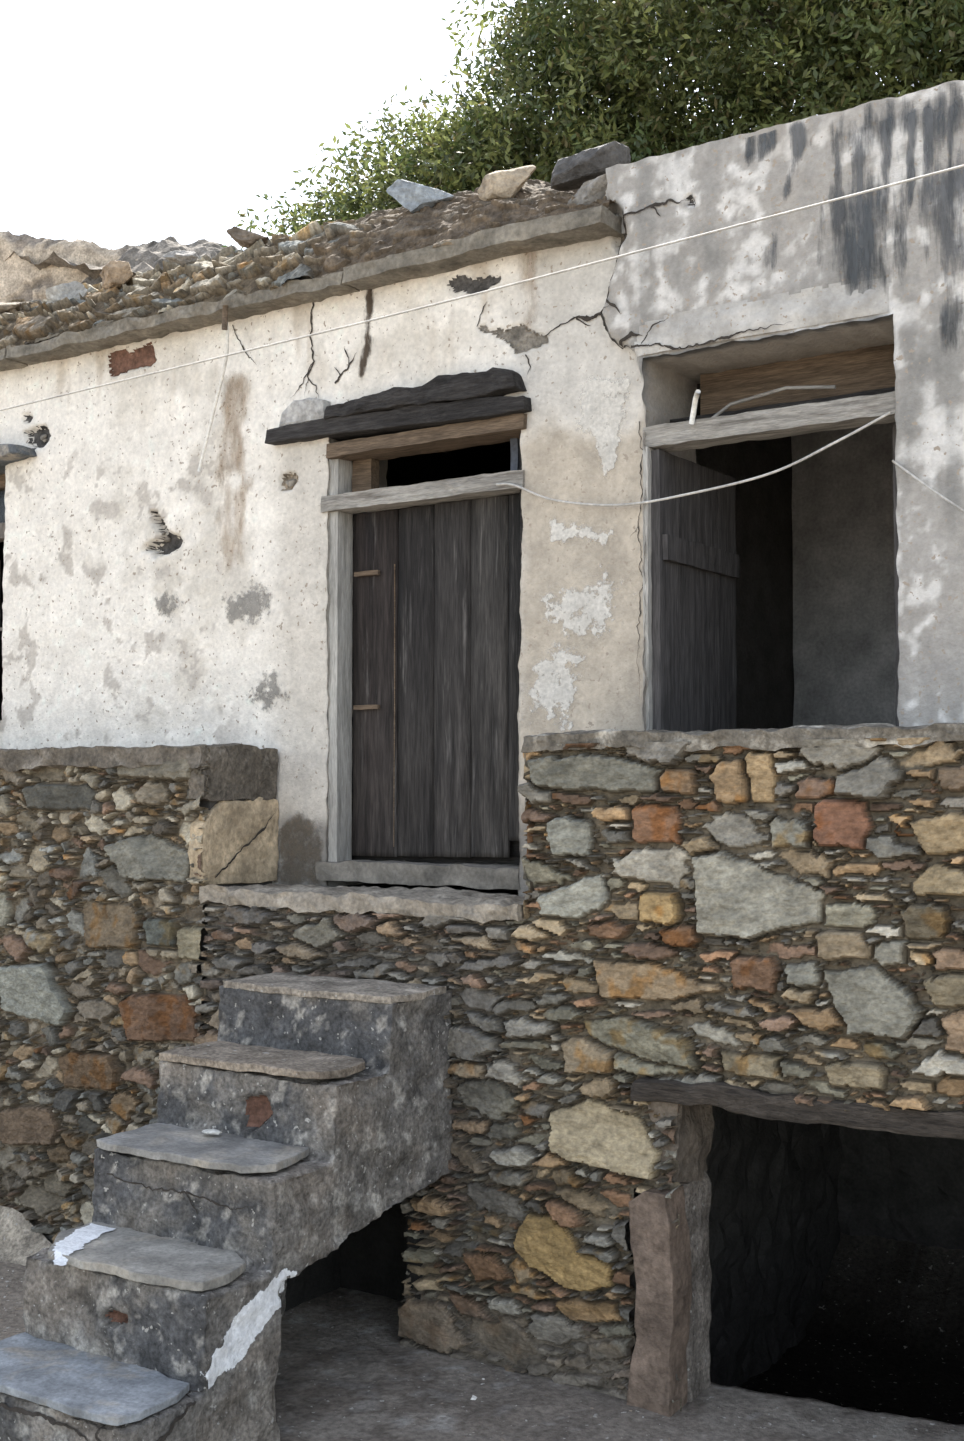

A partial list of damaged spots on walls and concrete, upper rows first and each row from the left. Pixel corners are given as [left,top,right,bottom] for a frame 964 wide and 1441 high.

leakage [745,122,805,197]
leakage [831,89,964,290]
flaking render [447,274,501,294]
crack [525,198,792,374]
flaking render [108,342,156,377]
crack [293,302,357,399]
leakage [941,304,959,344]